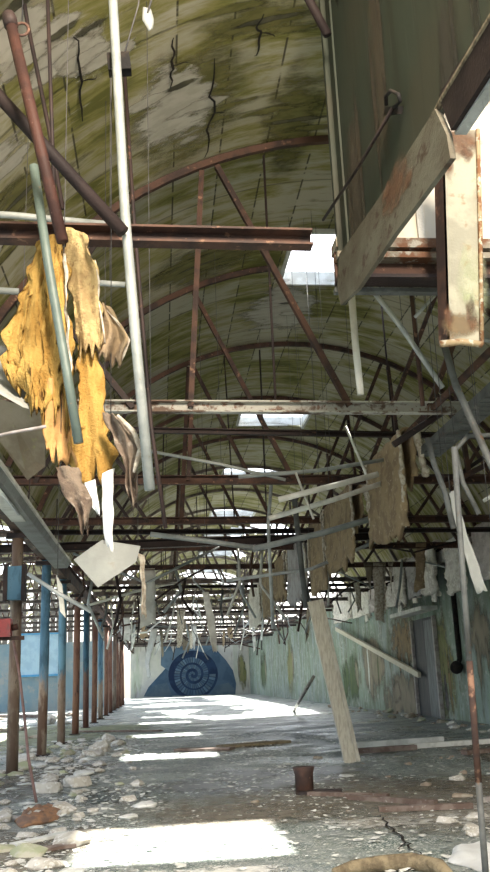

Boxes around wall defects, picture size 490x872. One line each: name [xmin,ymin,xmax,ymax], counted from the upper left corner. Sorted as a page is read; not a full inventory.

peeling [0,0,135,90]
crack [73,37,97,121]
crack [169,38,189,88]
peeling [129,64,229,146]
crack [204,58,224,158]
crack [255,14,275,56]
water stain [342,637,424,716]
water stain [470,601,490,688]
crack [379,815,422,854]